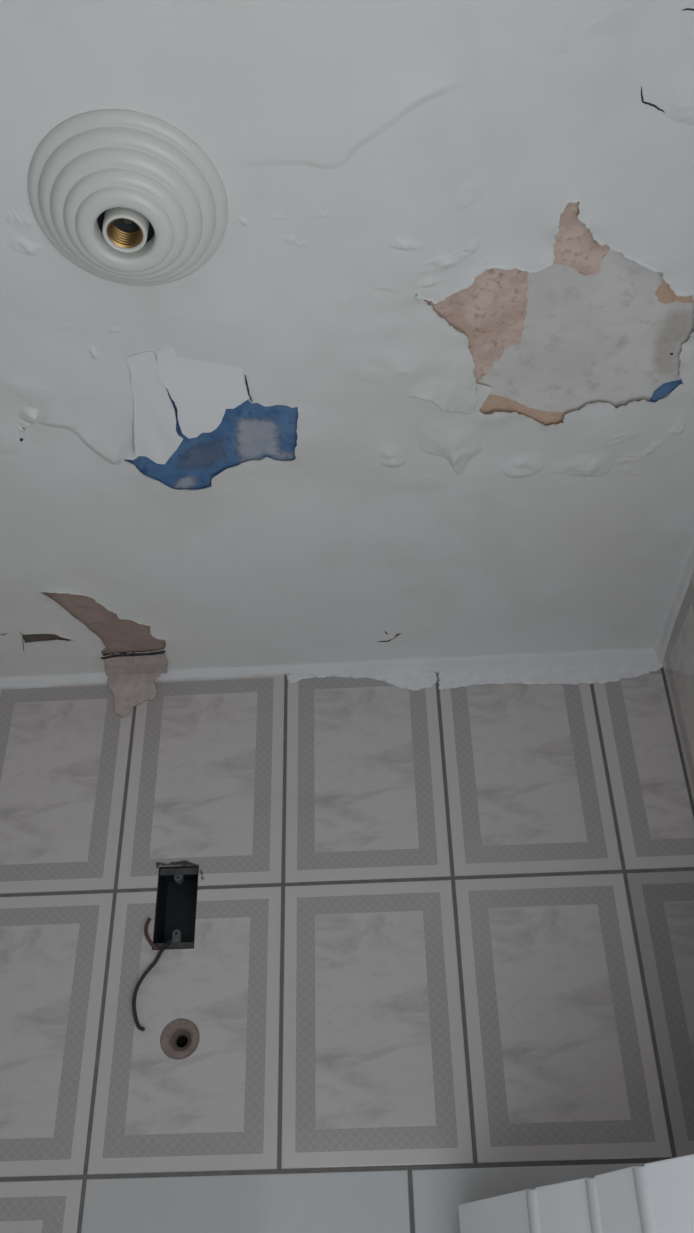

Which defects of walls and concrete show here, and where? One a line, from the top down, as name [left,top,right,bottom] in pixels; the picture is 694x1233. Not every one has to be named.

peeling [414,197,694,428]
peeling [122,349,301,492]
peeling [23,634,70,643]
peeling [36,590,168,717]